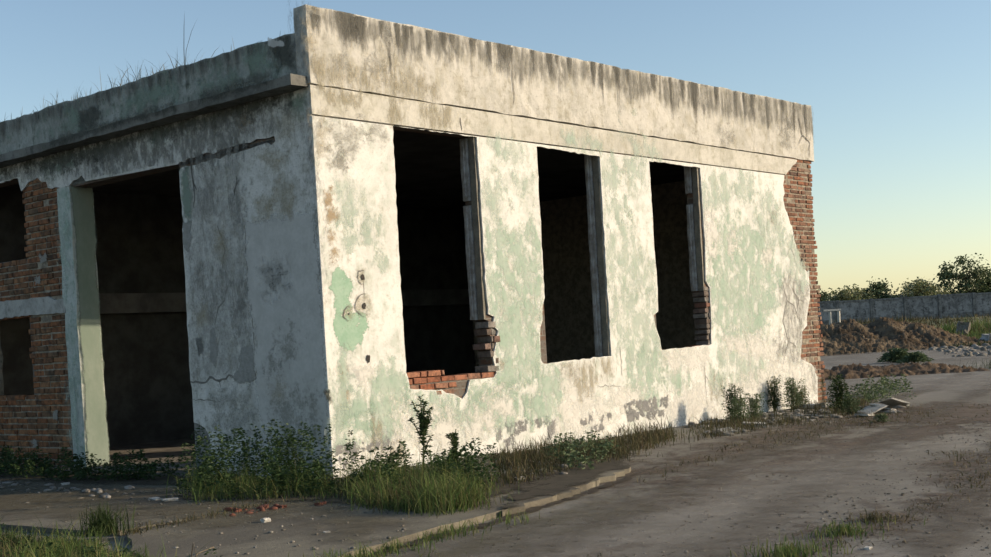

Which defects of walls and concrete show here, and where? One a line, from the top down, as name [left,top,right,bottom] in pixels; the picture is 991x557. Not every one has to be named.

water stain [0,44,306,175]
crack [181,140,274,207]
water stain [318,104,401,166]
water stain [308,7,813,147]
crack [190,370,257,402]
peeling [324,173,565,470]
peeling [686,172,807,396]